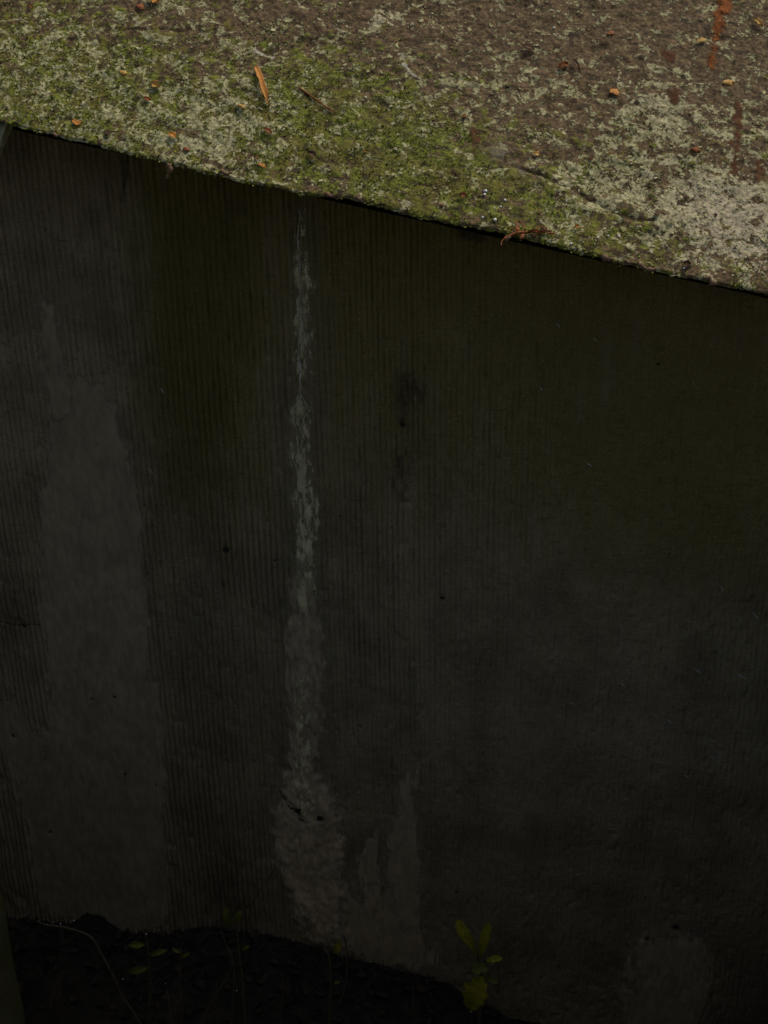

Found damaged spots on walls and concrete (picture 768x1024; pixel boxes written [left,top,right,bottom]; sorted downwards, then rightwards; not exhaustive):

water stain [282,208,330,821]